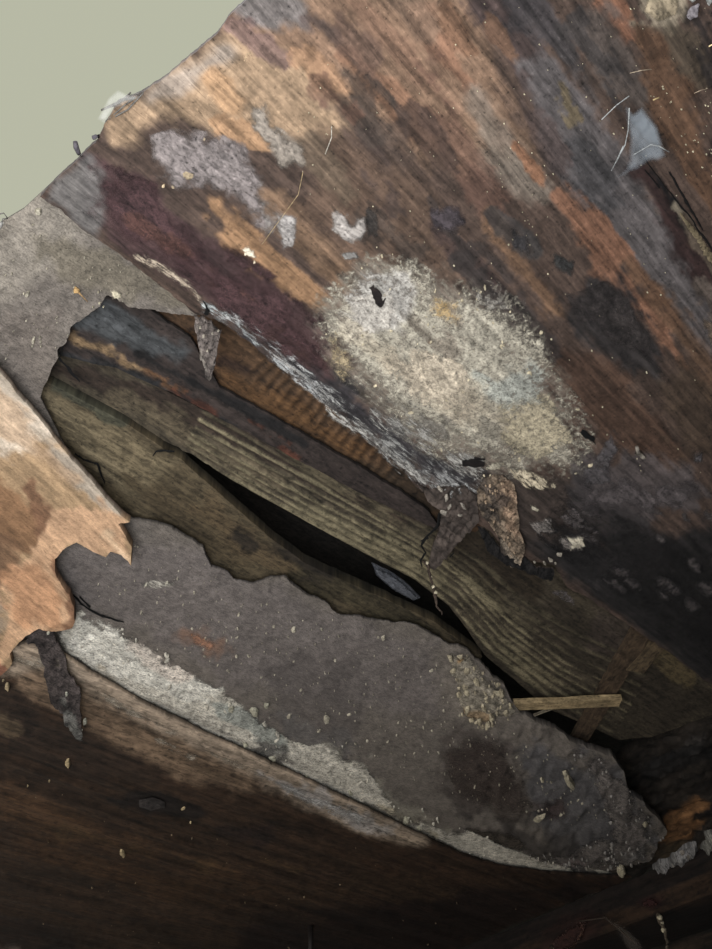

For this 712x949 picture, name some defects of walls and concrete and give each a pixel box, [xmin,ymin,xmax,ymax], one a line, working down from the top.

water stain [251,108,305,167]
crack [642,154,712,250]
spalling [369,285,386,307]
peeling [194,314,221,381]
water stain [97,131,712,653]
peeling [413,457,562,570]
spalling [26,610,664,878]